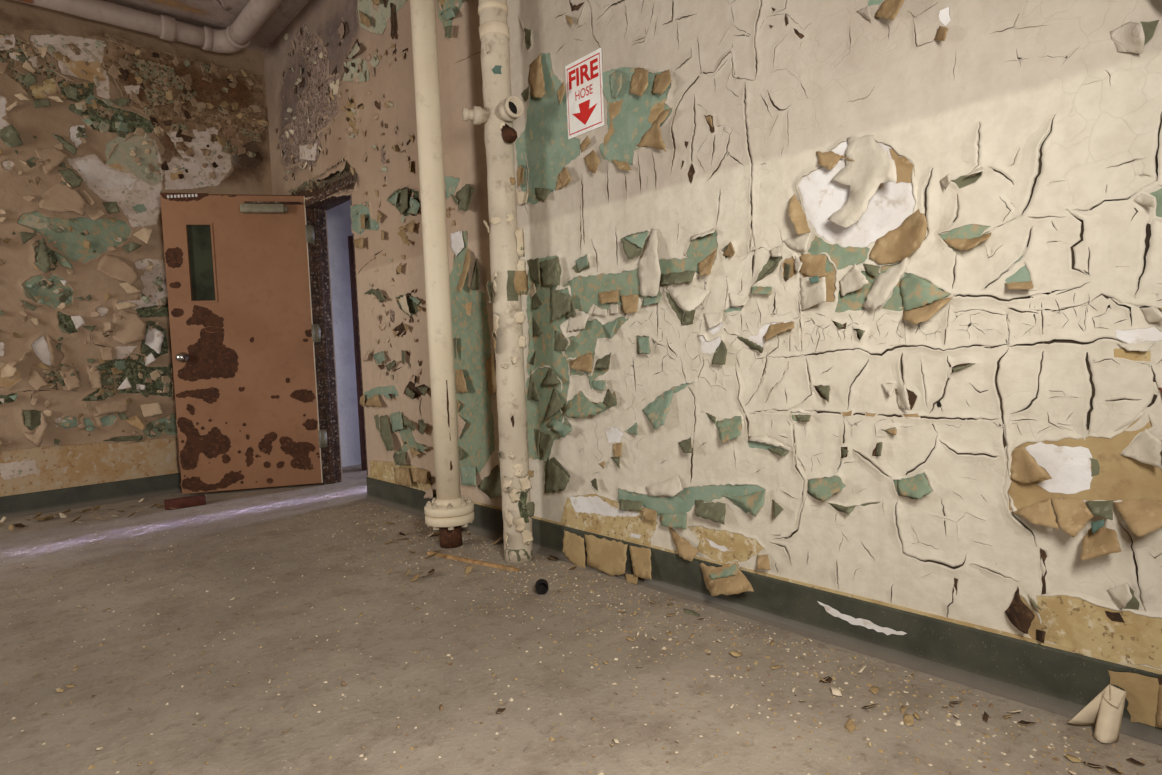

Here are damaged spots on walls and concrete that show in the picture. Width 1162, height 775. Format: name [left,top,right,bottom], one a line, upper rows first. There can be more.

peeling [435,0,469,41]
crack [517,14,525,52]
peeling [934,3,955,41]
rust [165,247,184,268]
peeling [0,0,434,499]
peeling [444,25,998,596]
rust [171,305,320,492]
peeling [1003,407,1162,560]
peeling [999,577,1162,729]